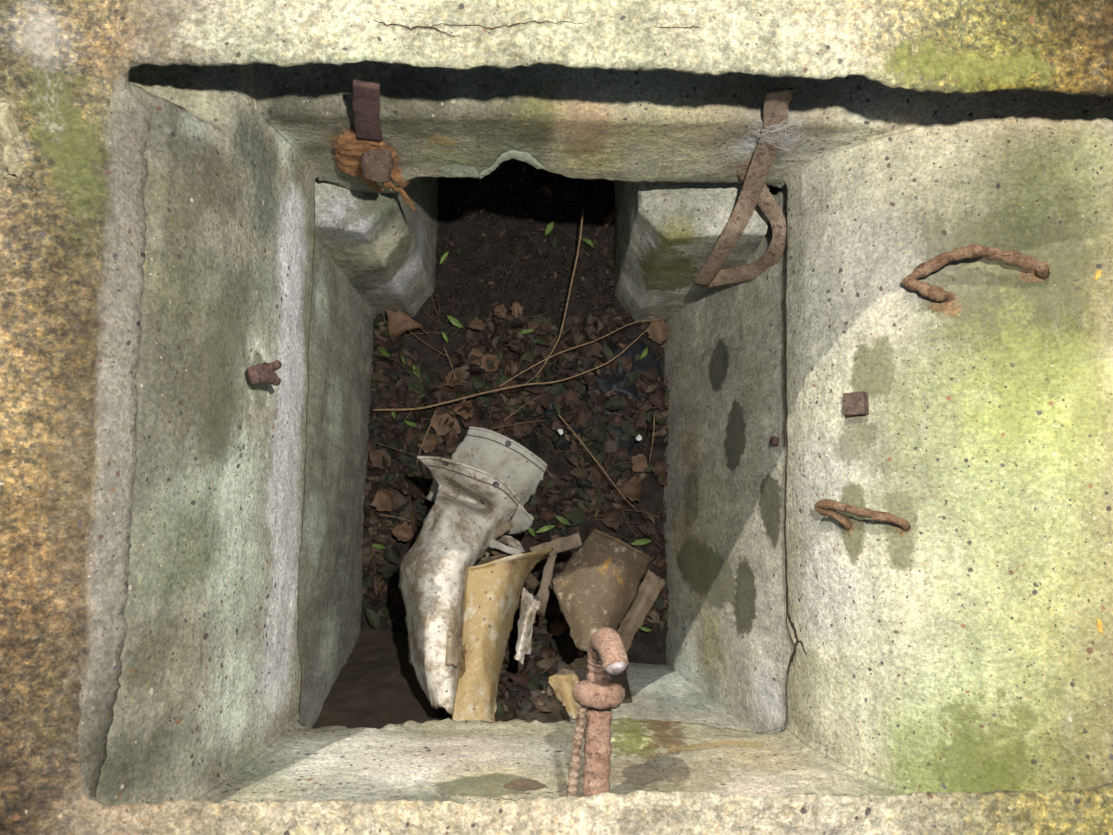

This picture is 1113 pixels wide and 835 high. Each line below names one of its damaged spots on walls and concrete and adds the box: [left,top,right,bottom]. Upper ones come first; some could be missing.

crack [374,20,588,37]
rust [928,294,962,317]
damp [709,338,729,392]
damp [850,337,894,395]
damp [724,400,746,471]
damp [759,473,782,546]
crack [756,335,806,733]
damp [839,484,865,563]
damp [884,492,918,570]
damp [676,540,757,634]